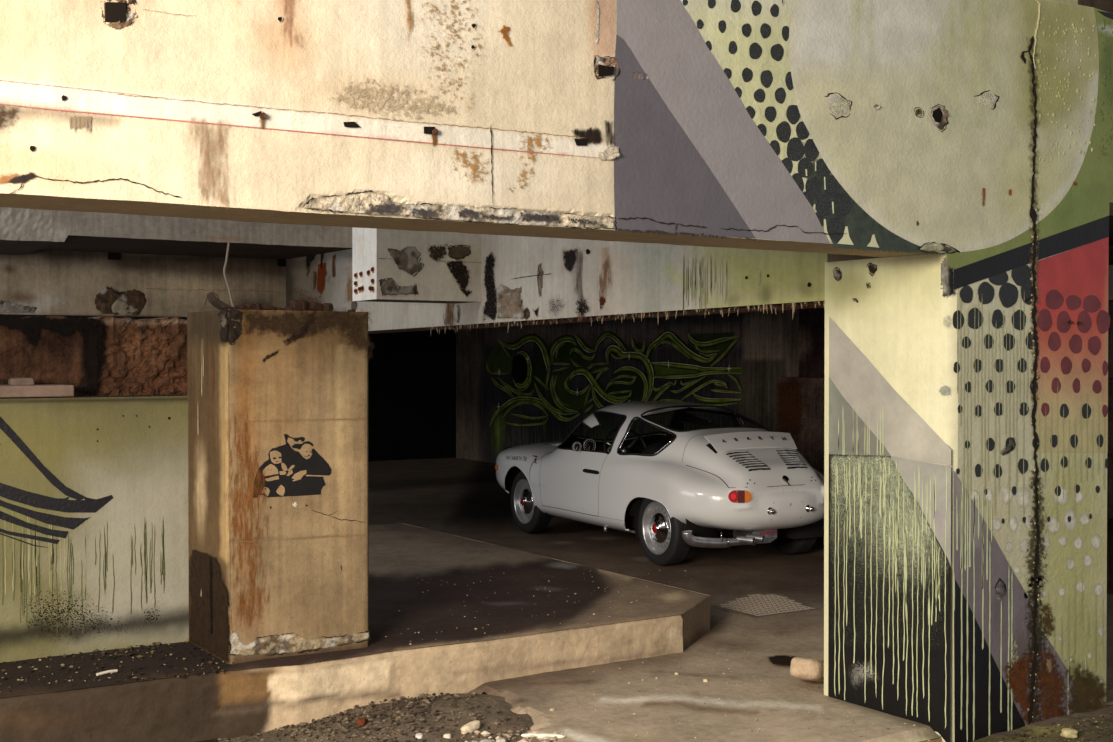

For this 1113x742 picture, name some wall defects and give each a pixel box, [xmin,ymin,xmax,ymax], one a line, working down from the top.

corrosion [406,0,483,107]
spalling [594,1,650,81]
peeling [824,93,852,120]
spalling [301,190,617,230]
peeling [95,287,146,316]
crack [1021,0,1050,725]
corrosion [230,420,268,625]
leakage [190,550,229,661]
spalling [229,631,371,656]
corrosion [1002,641,1069,722]